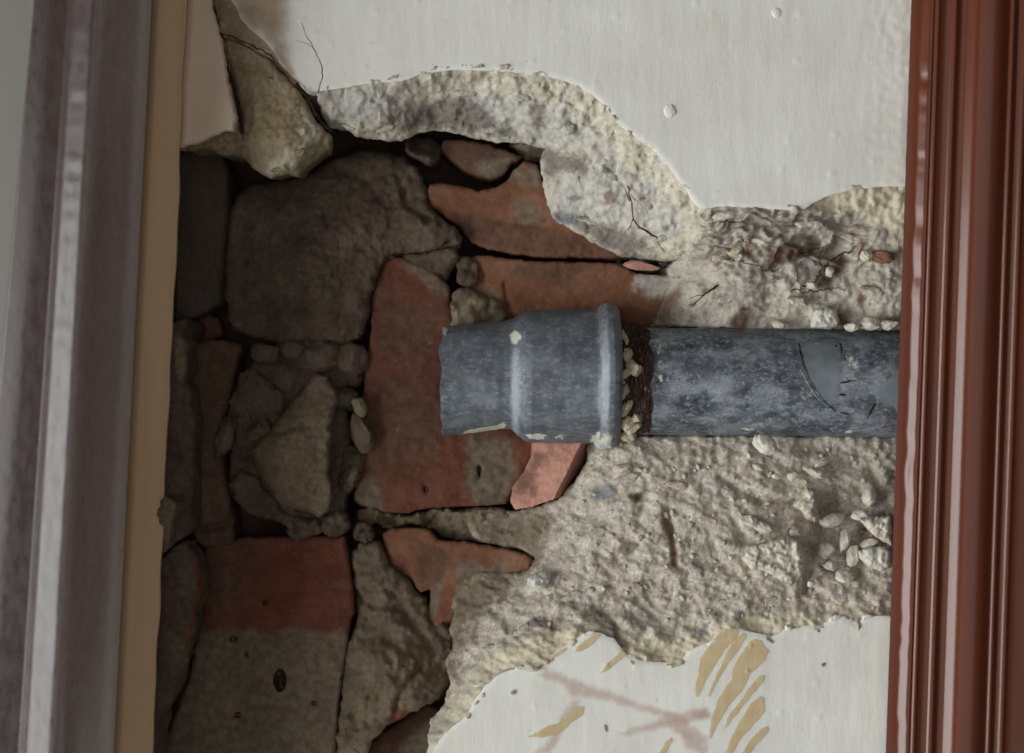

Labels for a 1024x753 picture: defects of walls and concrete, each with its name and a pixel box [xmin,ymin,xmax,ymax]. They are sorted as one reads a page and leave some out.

crack [213,0,332,134]
flaking render [187,0,905,331]
spalling [248,374,339,518]
flaking render [426,435,896,753]
spalling [273,669,287,692]